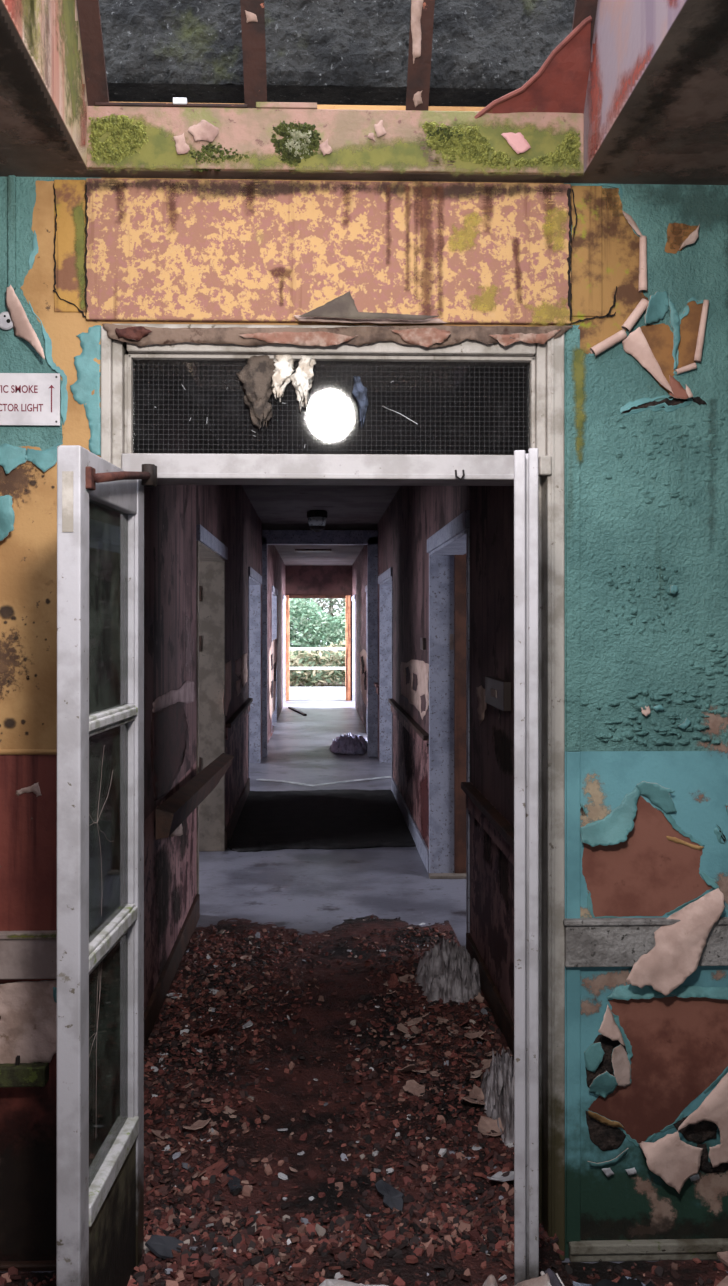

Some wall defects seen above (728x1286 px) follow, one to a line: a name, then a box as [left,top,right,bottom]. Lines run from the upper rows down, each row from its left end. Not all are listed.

leakage [484,190,493,227]
crack [567,188,617,324]
peeling [570,184,709,399]
peeling [0,180,101,755]
peeling [17,783,41,797]
peeling [698,706,728,753]
peeling [580,773,728,1237]